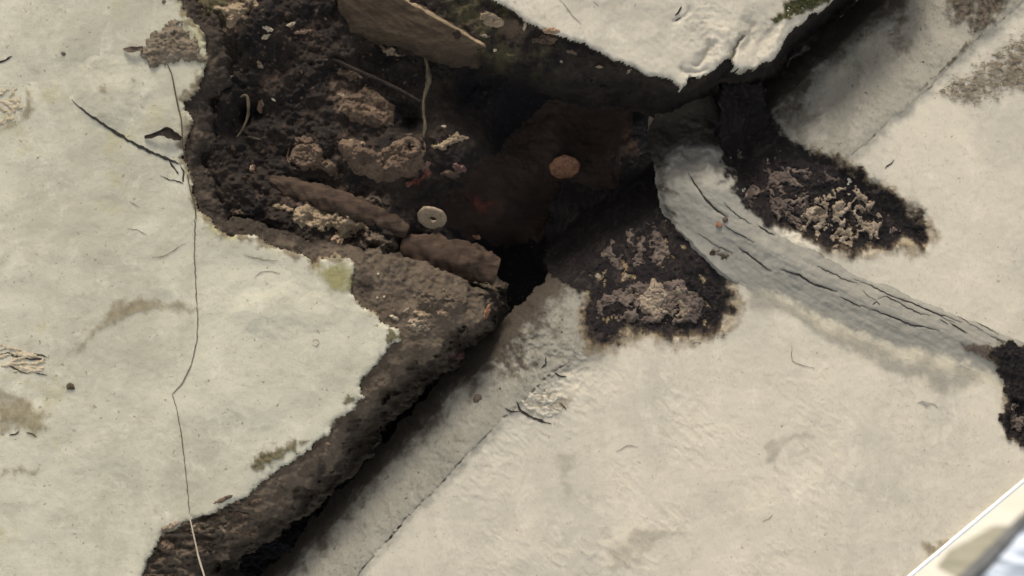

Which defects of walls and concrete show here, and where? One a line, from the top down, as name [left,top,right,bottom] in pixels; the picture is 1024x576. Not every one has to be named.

spalling [140,0,856,576]
crack [688,173,1006,343]
crack [505,399,566,424]